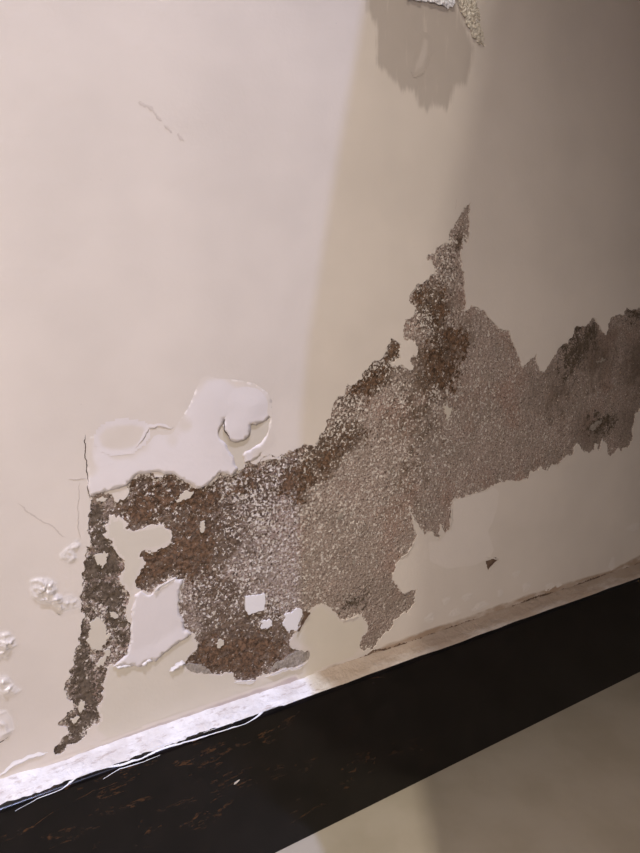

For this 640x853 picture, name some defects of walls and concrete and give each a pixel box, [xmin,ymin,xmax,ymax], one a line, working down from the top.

water stain [355,0,479,119]
flaking render [54,204,640,754]